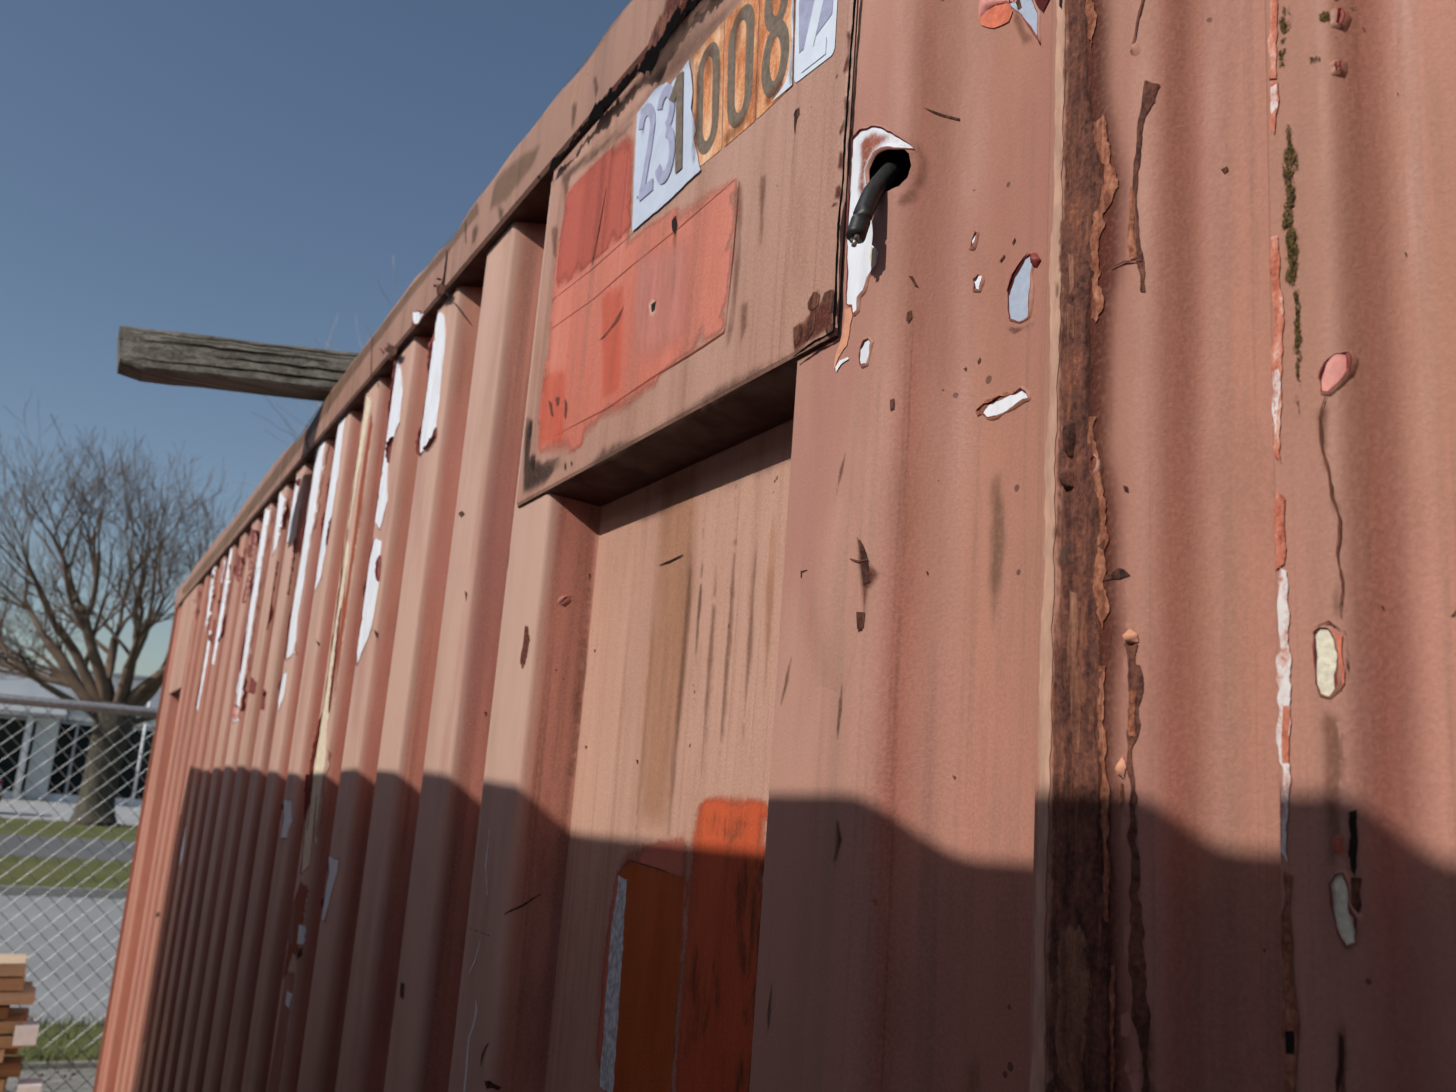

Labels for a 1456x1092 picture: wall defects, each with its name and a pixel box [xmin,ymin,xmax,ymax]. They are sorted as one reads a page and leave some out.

rust [612,0,717,93]
peeling [978,0,1048,45]
peeling [412,278,447,456]
peeling [834,124,915,371]
peeling [975,386,1031,421]
peeling [1007,252,1041,331]
peeling [1270,235,1284,462]
peeling [1318,350,1359,396]
rust [1044,0,1130,1092]
peeling [1312,620,1348,699]
peeling [1274,490,1299,1092]
peeling [1328,810,1365,949]